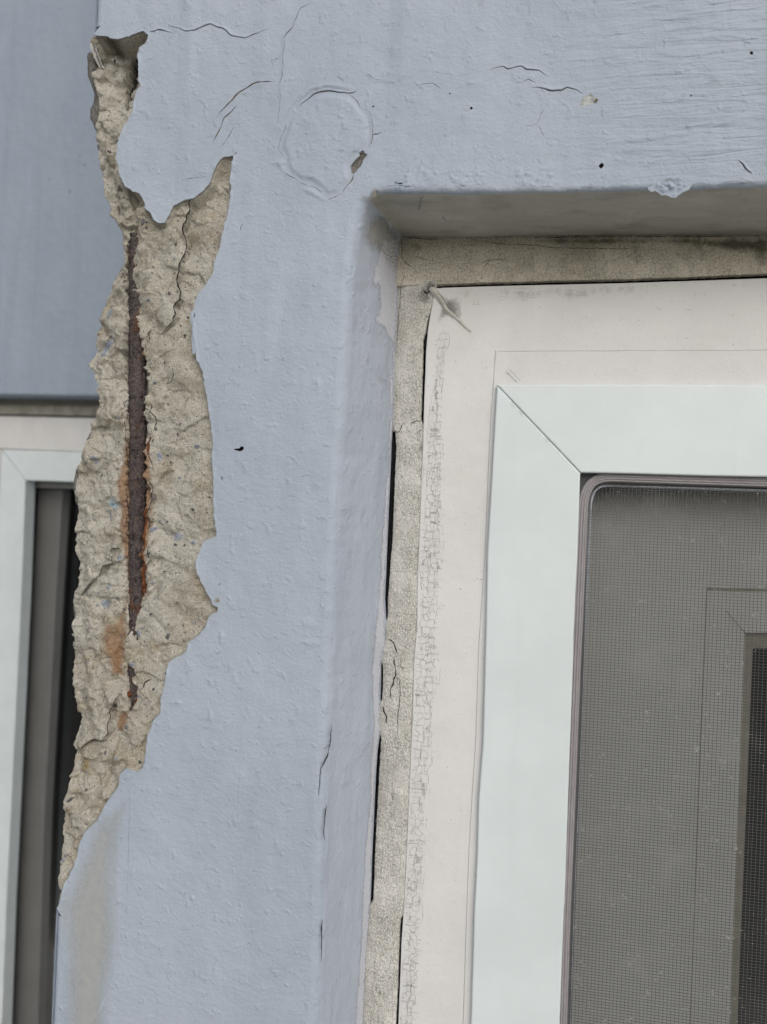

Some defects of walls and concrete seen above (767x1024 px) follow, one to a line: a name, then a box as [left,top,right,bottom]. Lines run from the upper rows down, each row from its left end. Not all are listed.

crack [146,1,440,200]
crack [490,63,583,136]
corrosion [118,437,153,603]
spalling [57,27,237,909]
corrosion [105,619,137,730]
crack [369,322,450,1024]